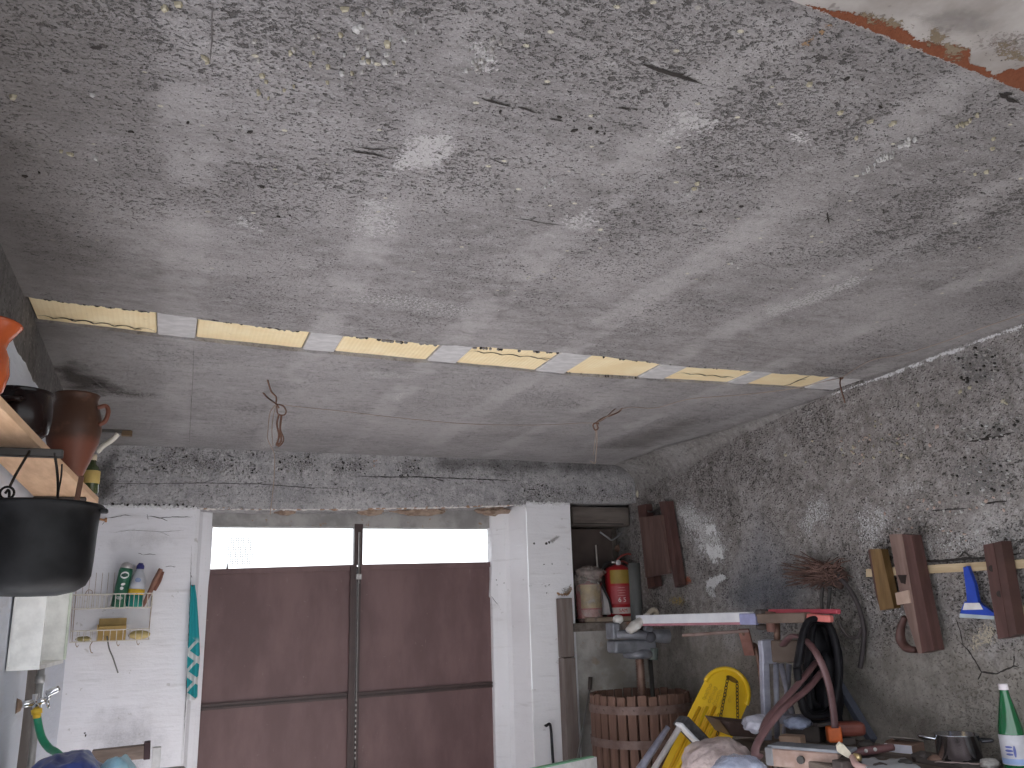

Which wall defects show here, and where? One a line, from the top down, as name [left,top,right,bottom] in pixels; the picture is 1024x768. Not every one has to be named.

crack [117,467,537,490]
crack [955,618,1021,680]